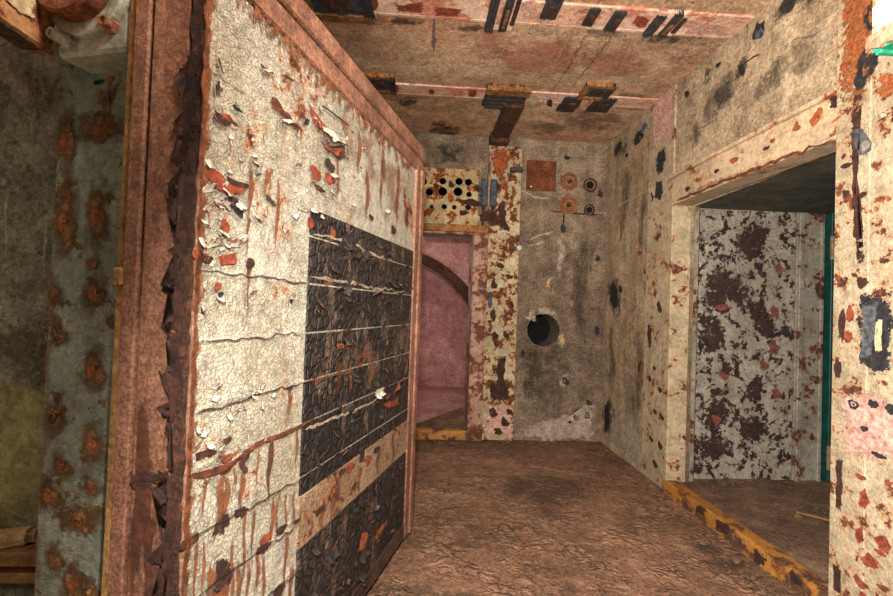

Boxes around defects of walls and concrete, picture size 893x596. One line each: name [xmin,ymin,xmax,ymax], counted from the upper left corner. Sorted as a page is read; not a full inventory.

corrosion [49,76,124,310]
peeling [192,101,279,269]
peeling [292,207,326,230]
peeling [282,103,363,195]
corrosion [238,0,412,234]
corrosion [493,147,516,203]
peeling [202,282,226,303]
corrosion [182,0,295,596]
damp [0,386,45,529]